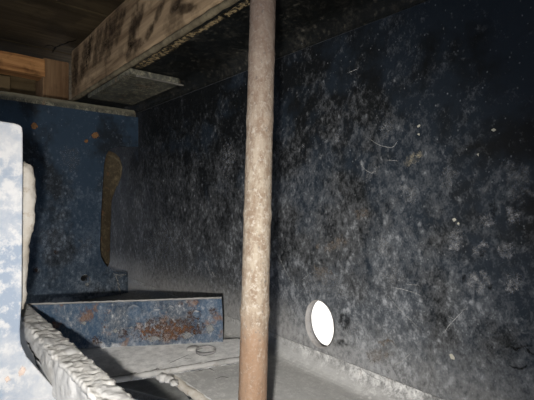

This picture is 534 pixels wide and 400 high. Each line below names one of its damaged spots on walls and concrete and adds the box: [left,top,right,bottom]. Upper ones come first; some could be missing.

damp [72,10,125,88]
damp [128,5,143,50]
damp [172,0,193,14]
corrosion [134,310,204,341]